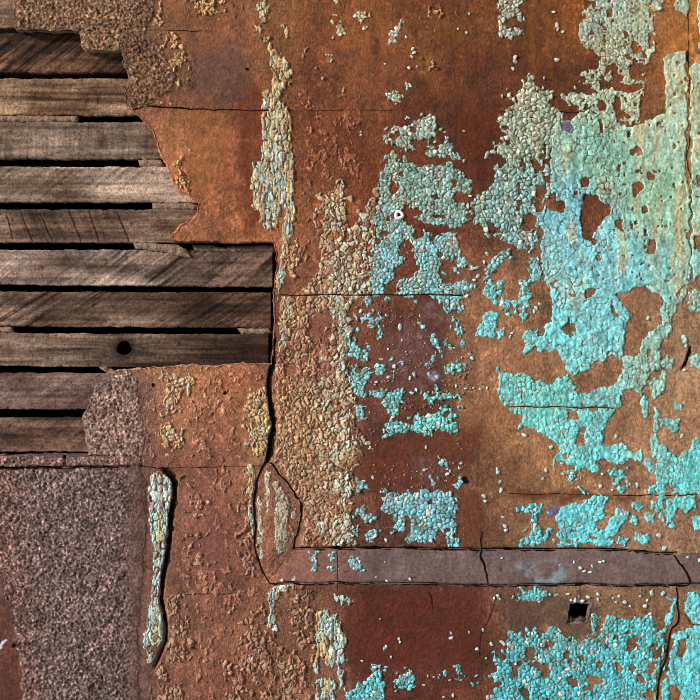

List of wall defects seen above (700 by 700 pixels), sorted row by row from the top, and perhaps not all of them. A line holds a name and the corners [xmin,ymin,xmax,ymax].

rust [664,0,700,64]
rust [237,86,262,235]
peeling [13,0,700,548]
flaking render [0,347,274,700]
peeling [149,513,388,700]
crack [253,338,694,700]
peeling [393,586,700,700]
rust [517,489,580,504]